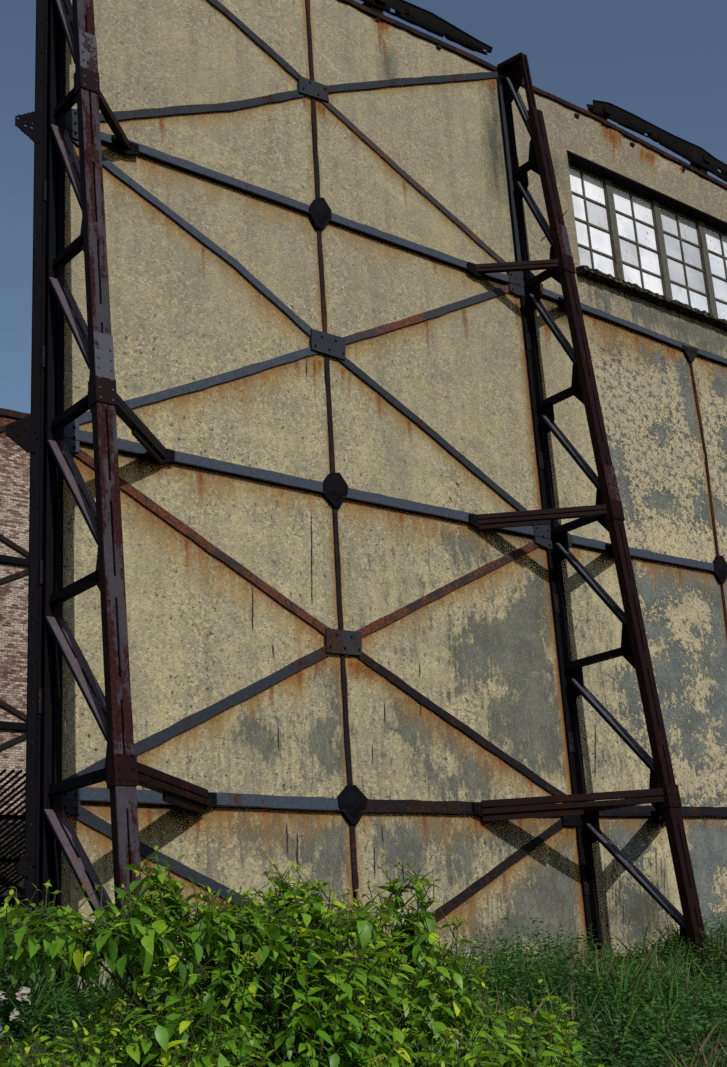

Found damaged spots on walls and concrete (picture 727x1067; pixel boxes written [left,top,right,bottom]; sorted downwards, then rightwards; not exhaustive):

corrosion [128,103,271,127]
corrosion [102,166,253,292]
corrosion [550,598,572,793]
peeling [586,281,727,958]